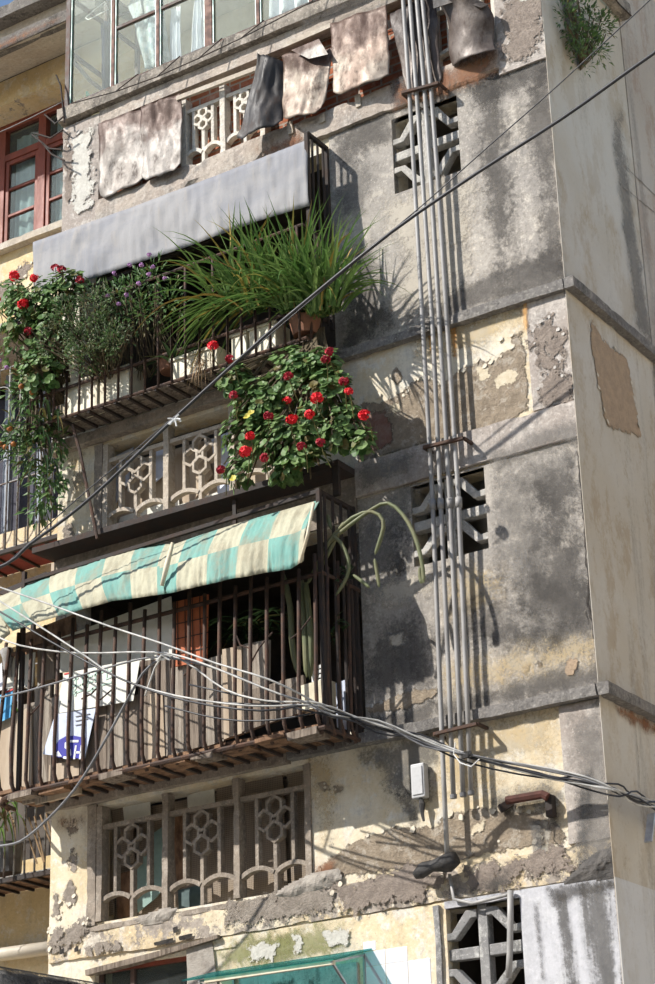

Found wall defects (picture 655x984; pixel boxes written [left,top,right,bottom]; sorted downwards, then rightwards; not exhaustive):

peeling [500,0,543,72]
peeling [62,127,96,218]
water stain [335,60,564,347]
peeling [0,261,33,303]
peeling [354,312,574,463]
peeling [589,321,641,438]
water stain [356,423,598,729]
water stain [360,733,438,834]
peeling [46,821,121,958]
peeling [223,806,578,930]
water stain [548,879,623,984]